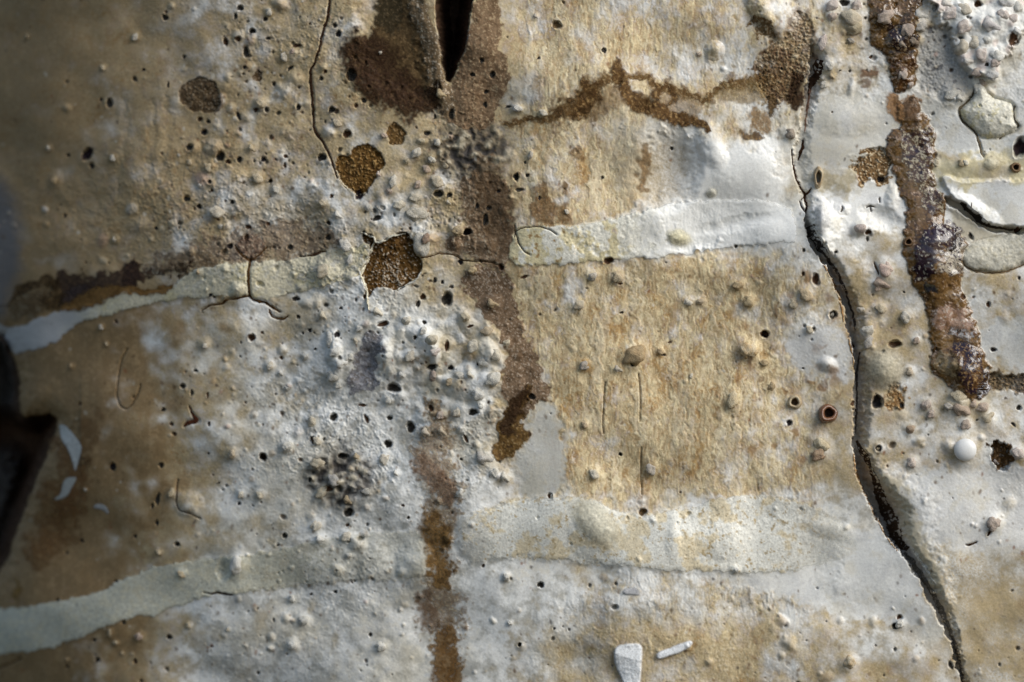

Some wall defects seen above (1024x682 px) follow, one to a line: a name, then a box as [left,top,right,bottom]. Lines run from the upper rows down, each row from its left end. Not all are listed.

spalling [167,77,223,135]
crack [309,0,338,178]
corrosion [340,0,806,140]
corrosion [861,67,879,88]
corrosion [887,93,922,123]
spalling [318,122,406,199]
spalling [848,147,893,188]
crack [203,245,288,320]
spalling [360,231,422,310]
water stain [347,331,385,395]
crack [791,59,965,682]